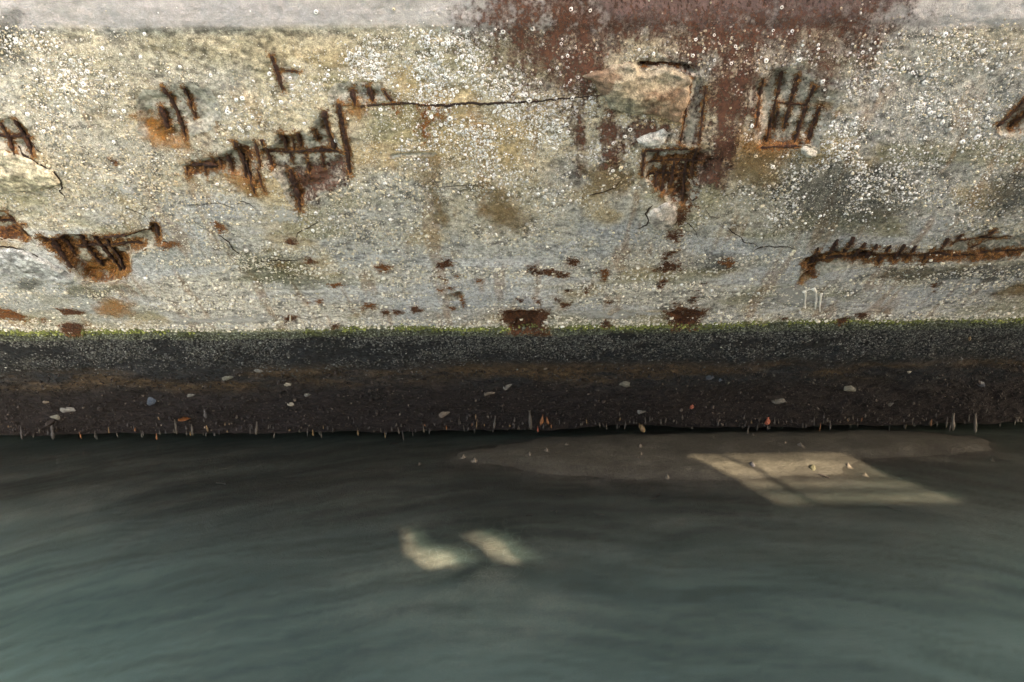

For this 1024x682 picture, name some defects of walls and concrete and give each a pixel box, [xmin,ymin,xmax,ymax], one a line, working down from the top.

spalling [0,114,39,162]
spalling [135,79,395,218]
crack [346,95,601,108]
spalling [637,60,723,213]
spalling [745,64,846,155]
spalling [0,206,168,284]
spalling [796,226,1024,283]
corrosion [0,297,136,337]
corrosion [359,302,425,318]
corrosion [435,256,466,311]
corrosion [498,256,612,337]
corrosion [657,282,713,333]